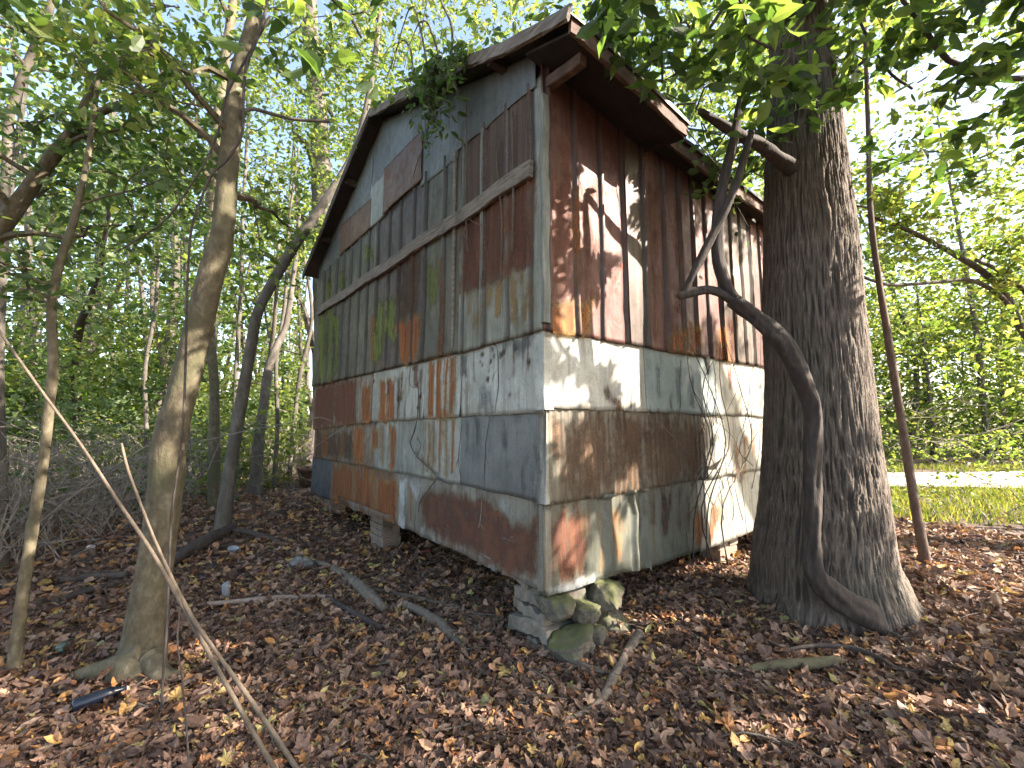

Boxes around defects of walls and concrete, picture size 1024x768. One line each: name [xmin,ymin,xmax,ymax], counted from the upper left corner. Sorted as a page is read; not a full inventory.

corrosion [315,251,706,582]
corrosion [716,318,738,388]